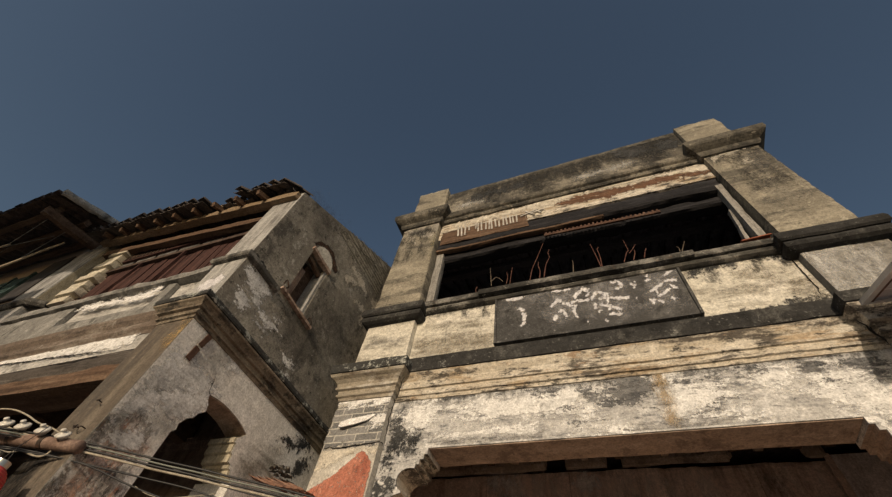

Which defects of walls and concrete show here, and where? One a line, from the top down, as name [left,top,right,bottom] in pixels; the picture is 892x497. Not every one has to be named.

peeling [234,265,282,338]
peeling [44,344,221,497]
leakage [276,432,315,478]
flaking render [313,397,391,475]
leakage [371,401,425,497]
peeling [396,354,892,445]